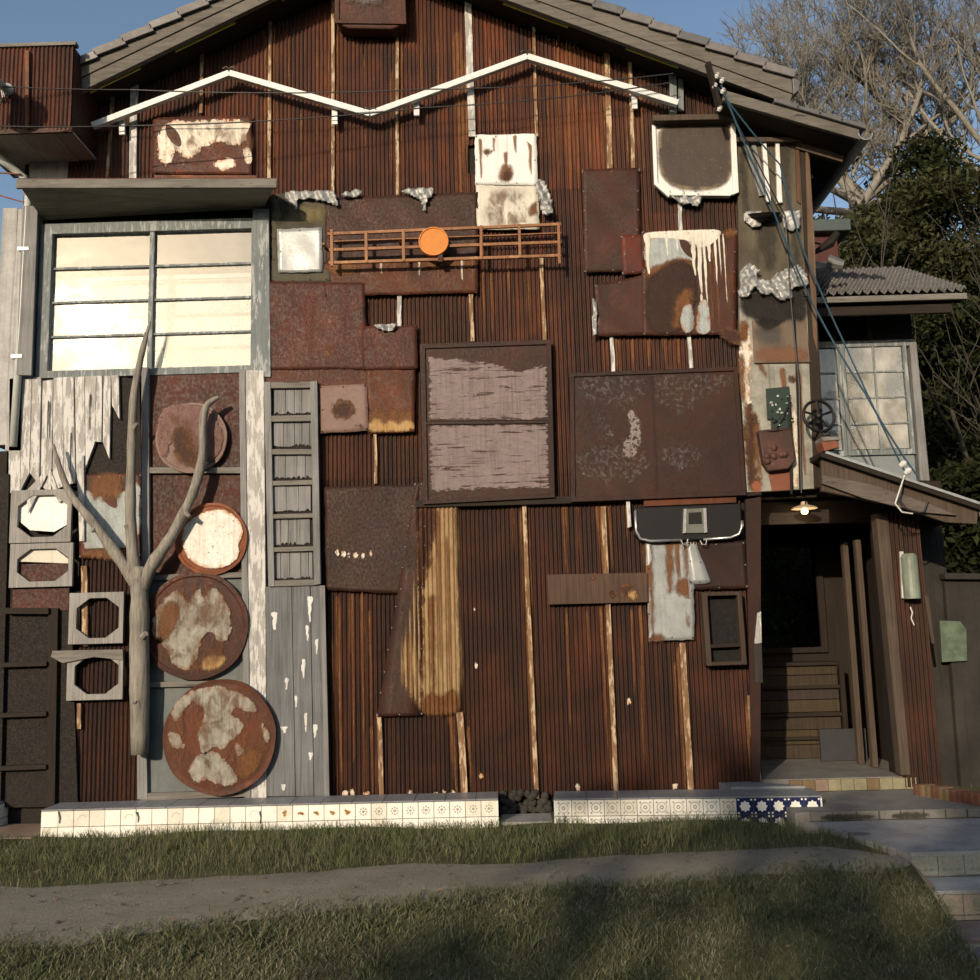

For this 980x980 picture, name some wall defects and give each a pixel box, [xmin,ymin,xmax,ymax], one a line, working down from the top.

peeling [157,119,252,172]
rust [452,31,538,224]
damp [658,124,749,213]
damp [782,145,790,210]
damp [755,226,776,269]
rust [645,258,698,367]
rust [359,408,414,432]
peeling [428,357,550,492]
rust [665,542,689,599]
peeling [305,596,318,654]
rust [401,507,484,793]
peeling [285,677,318,738]